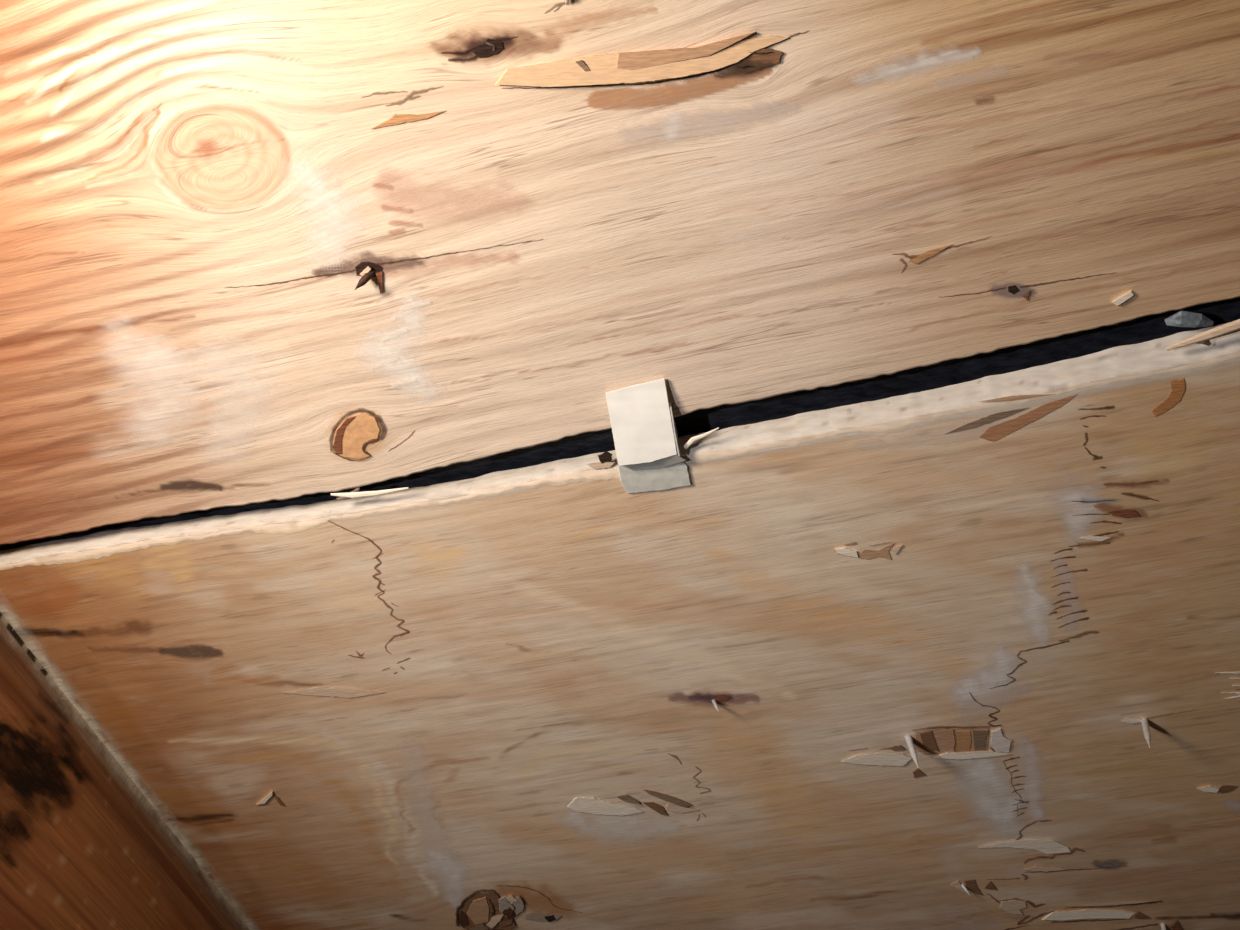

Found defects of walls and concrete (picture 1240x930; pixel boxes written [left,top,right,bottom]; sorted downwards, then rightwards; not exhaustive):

peeling [617,32,754,70]
crack [322,516,410,674]
crack [848,725,1000,752]
peeling [954,730,989,752]
water stain [0,703,84,866]
crack [988,848,1162,930]